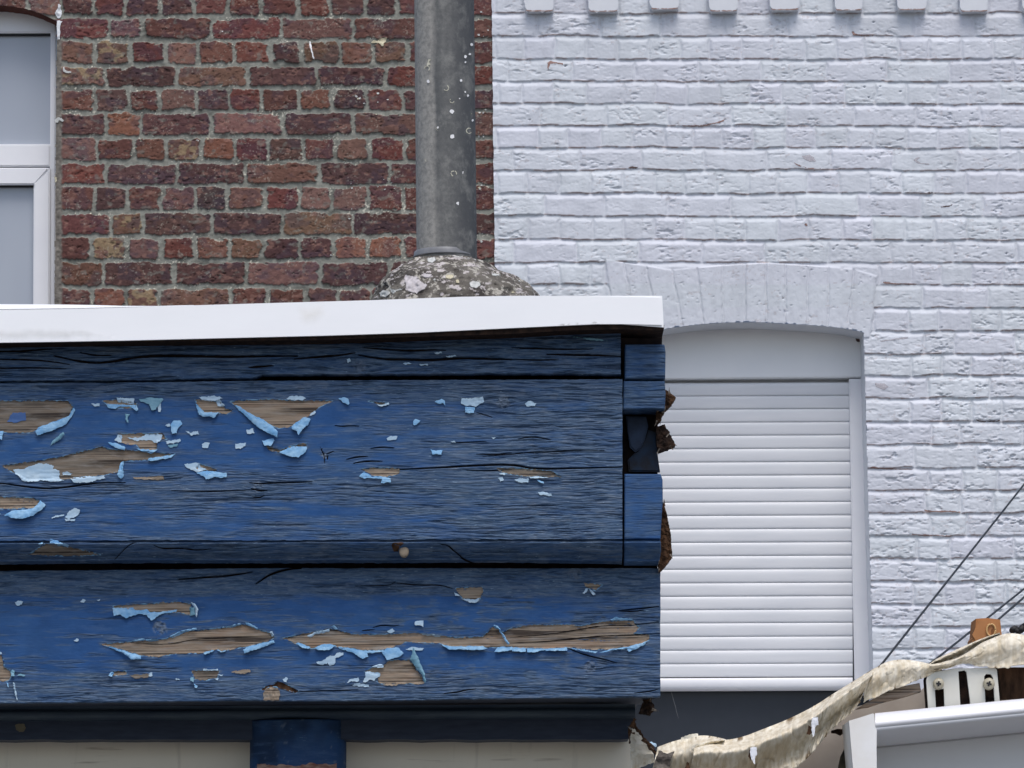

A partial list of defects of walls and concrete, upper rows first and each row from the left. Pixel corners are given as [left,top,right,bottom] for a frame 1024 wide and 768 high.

peeling [461,397,484,413]
peeling [196,395,349,457]
peeling [0,397,210,483]
peeling [184,462,227,479]
peeling [359,467,400,483]
peeling [497,467,558,496]
peeling [0,496,80,521]
peeling [454,587,483,603]
peeling [102,602,649,688]
peeling [261,677,298,701]